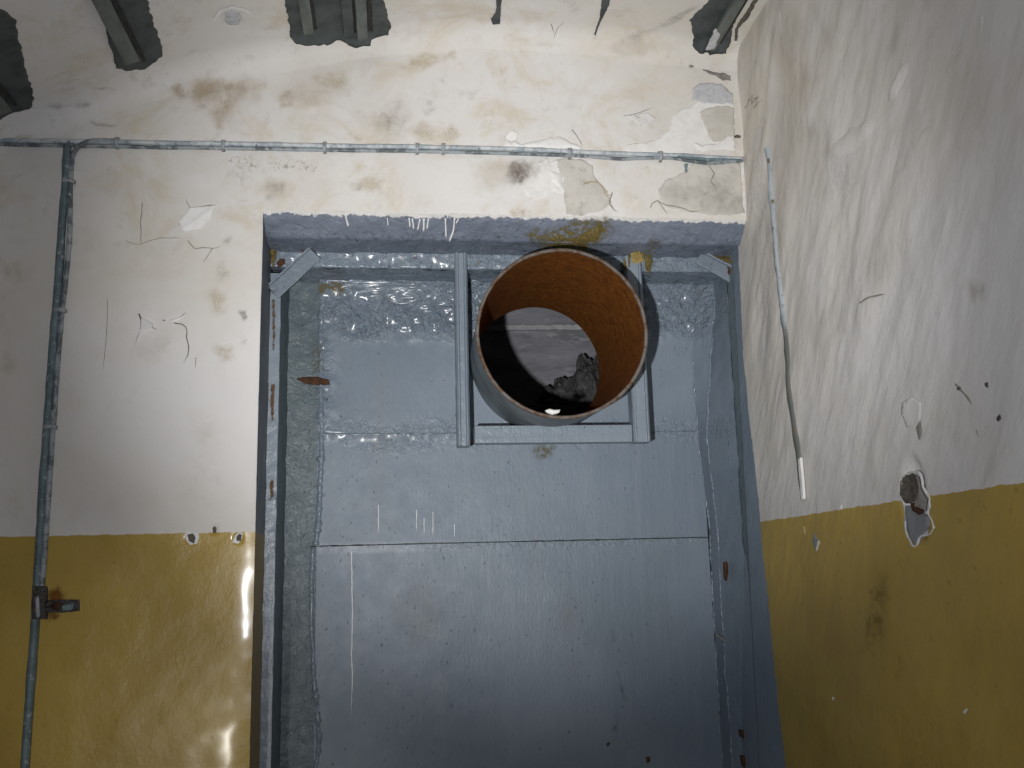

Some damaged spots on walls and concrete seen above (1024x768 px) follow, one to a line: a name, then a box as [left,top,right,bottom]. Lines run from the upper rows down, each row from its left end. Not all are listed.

peeling [503,130,617,216]
peeling [622,65,745,216]
crack [126,203,220,261]
crack [163,313,196,368]
spalling [899,471,935,547]